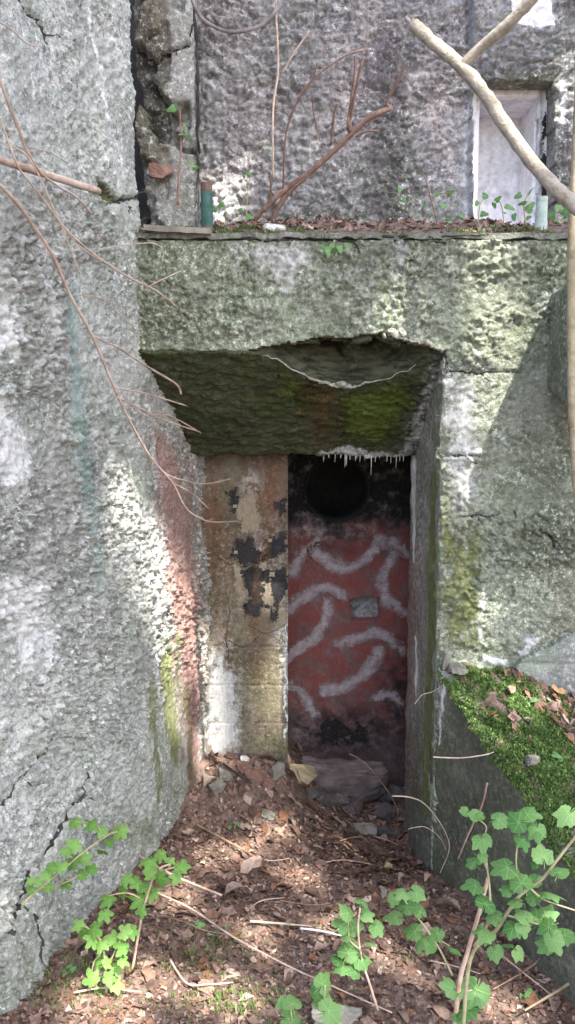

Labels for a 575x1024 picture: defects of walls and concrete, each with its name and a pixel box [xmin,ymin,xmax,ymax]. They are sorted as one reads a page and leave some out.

damp [144,403,170,569]
peeling [225,486,288,627]
damp [321,388,432,564]
crack [0,738,52,806]
damp [148,633,194,802]
crack [2,772,95,967]